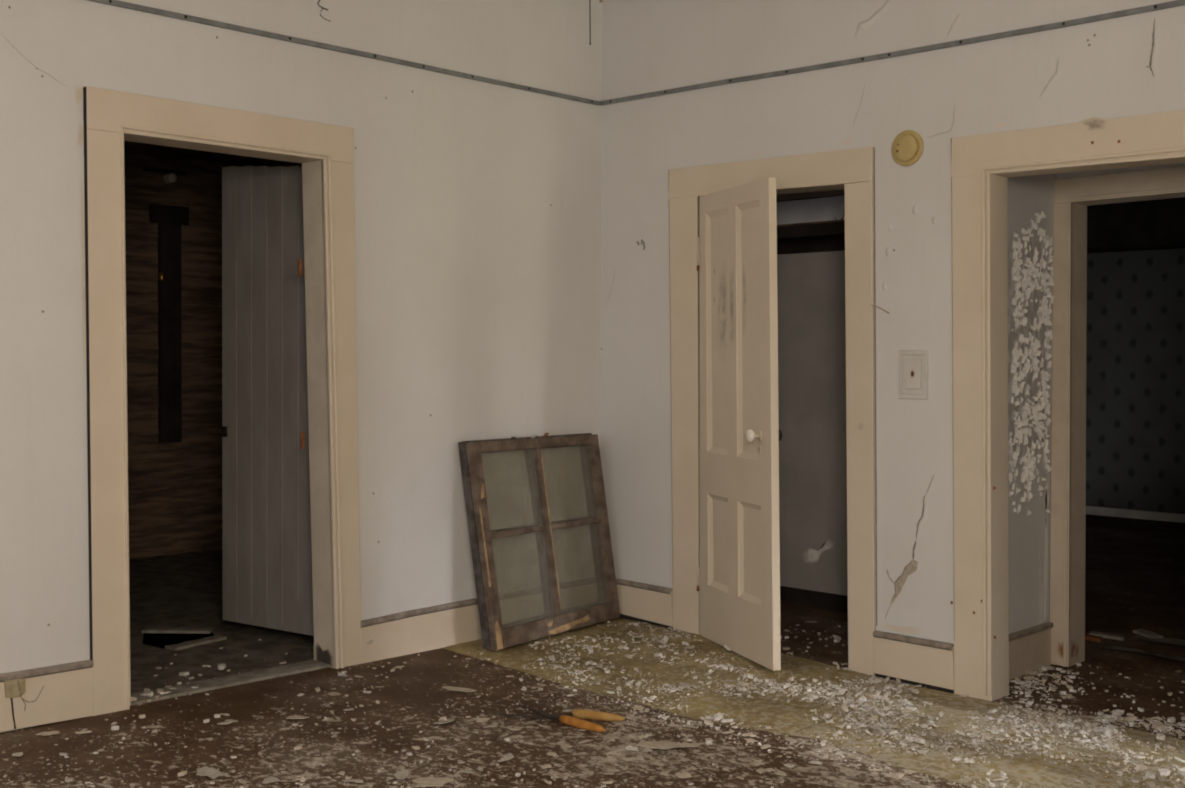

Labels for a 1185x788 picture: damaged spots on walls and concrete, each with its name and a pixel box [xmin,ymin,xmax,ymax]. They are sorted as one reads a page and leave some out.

crack [1146,17,1162,77]
crack [885,475,938,618]